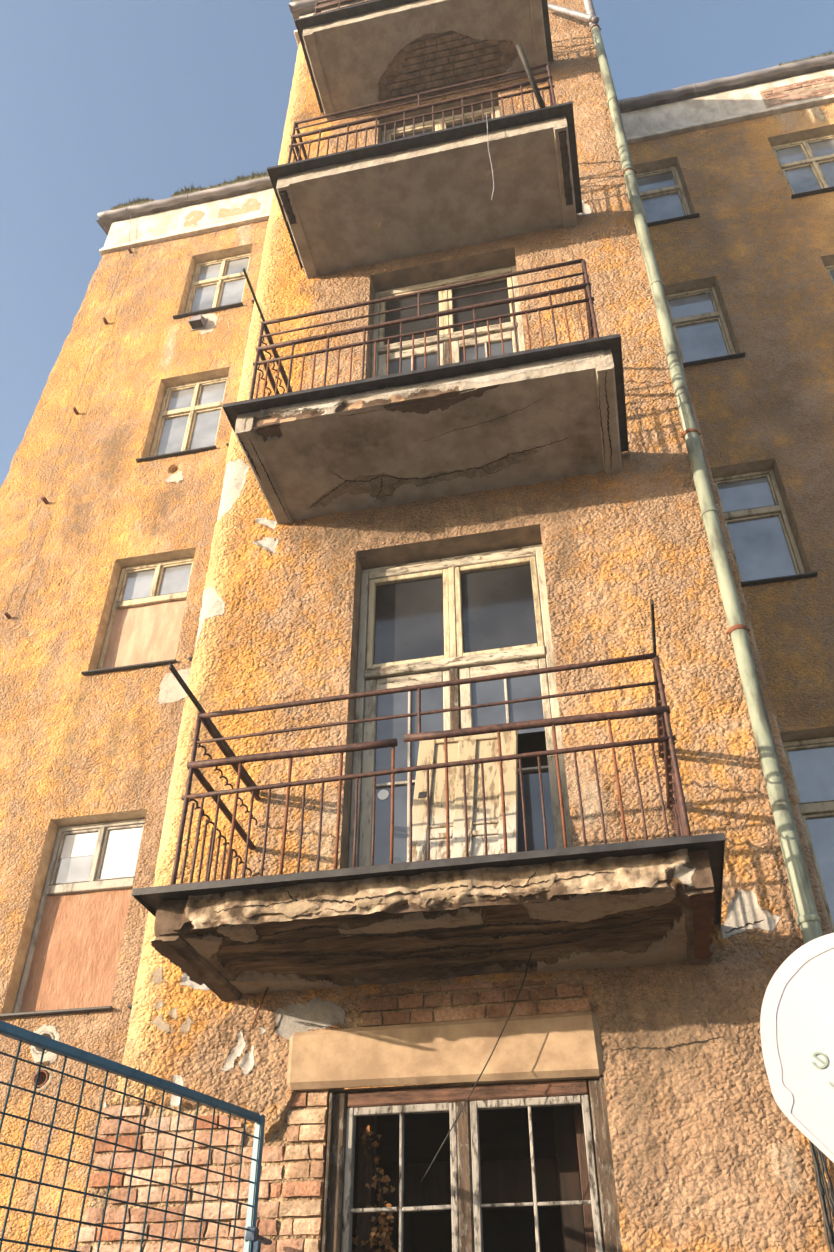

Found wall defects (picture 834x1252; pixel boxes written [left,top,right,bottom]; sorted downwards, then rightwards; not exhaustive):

flaking render [378,31,519,105]
flaking render [760,75,834,108]
peeling [253,350,604,442]
crack [598,372,612,469]
flaking render [217,459,250,521]
crack [238,436,567,520]
flaking render [158,587,225,704]
flaking render [721,889,780,939]
spalling [149,850,714,1076]